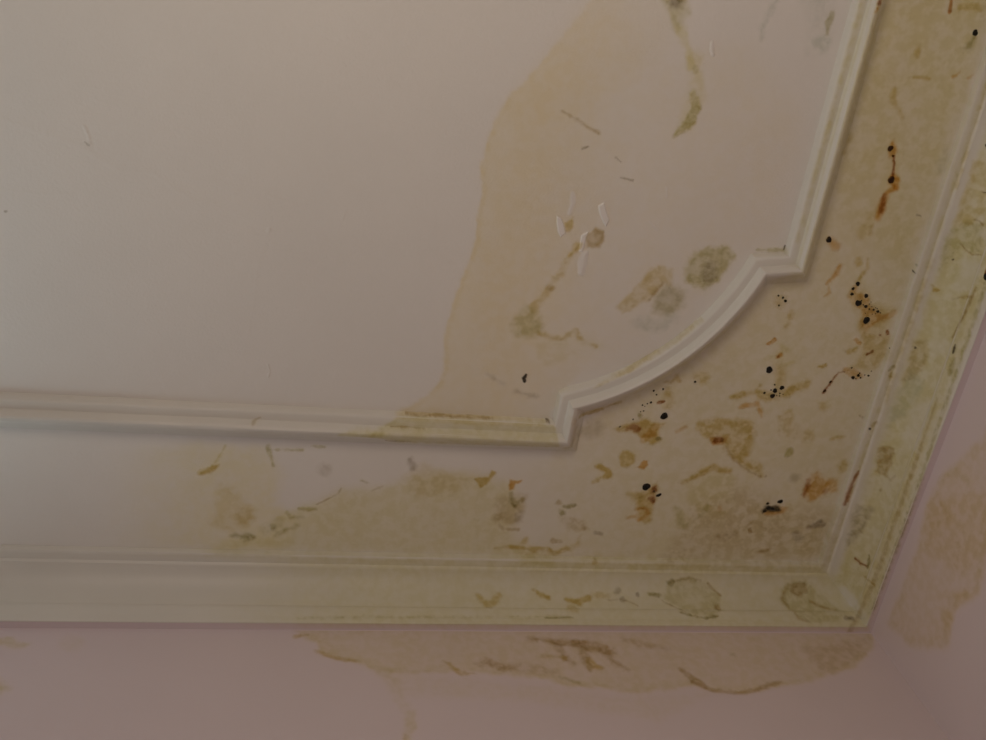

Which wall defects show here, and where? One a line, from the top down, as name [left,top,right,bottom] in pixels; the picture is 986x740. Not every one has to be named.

damp [850,282,881,324]